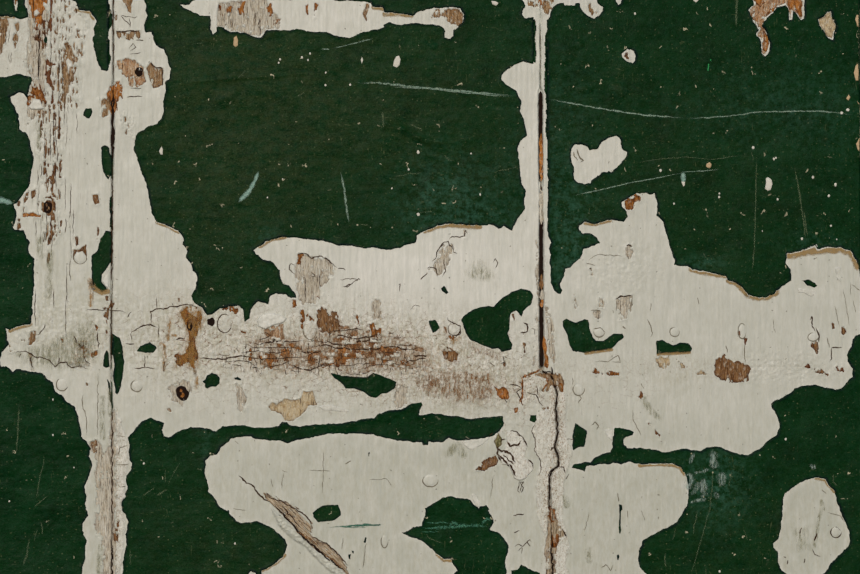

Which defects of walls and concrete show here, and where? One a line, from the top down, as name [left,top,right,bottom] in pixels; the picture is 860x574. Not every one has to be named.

peeling [181,0,464,47]
peeling [546,0,603,18]
peeling [749,0,804,56]
crack [536,29,544,191]
peeling [571,136,627,184]
crack [289,253,360,302]
crack [421,230,467,279]
crack [591,295,653,336]
crack [203,328,426,375]
crack [490,222,589,574]
peeling [82,446,109,574]
peeling [773,477,850,574]